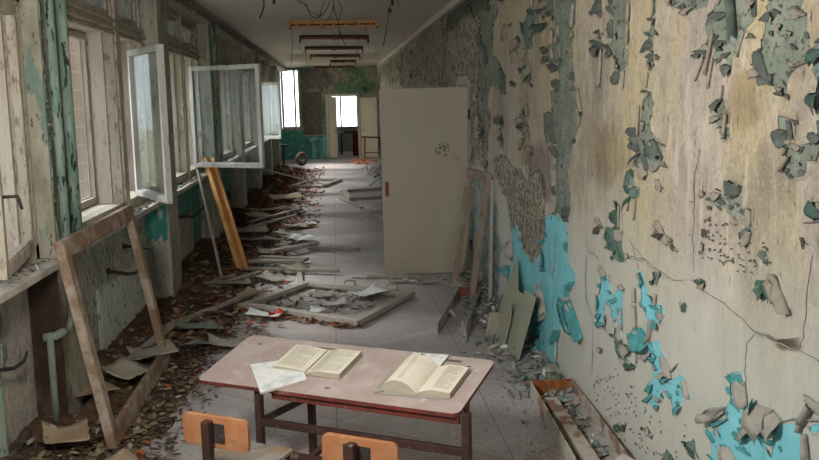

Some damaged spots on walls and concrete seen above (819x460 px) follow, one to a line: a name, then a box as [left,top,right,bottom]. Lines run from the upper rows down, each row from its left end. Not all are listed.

peeling [300,69,335,92]
peeling [361,0,582,367]
peeling [588,0,819,264]
peeling [593,265,819,460]
crack [628,238,819,407]
peeling [697,178,792,315]